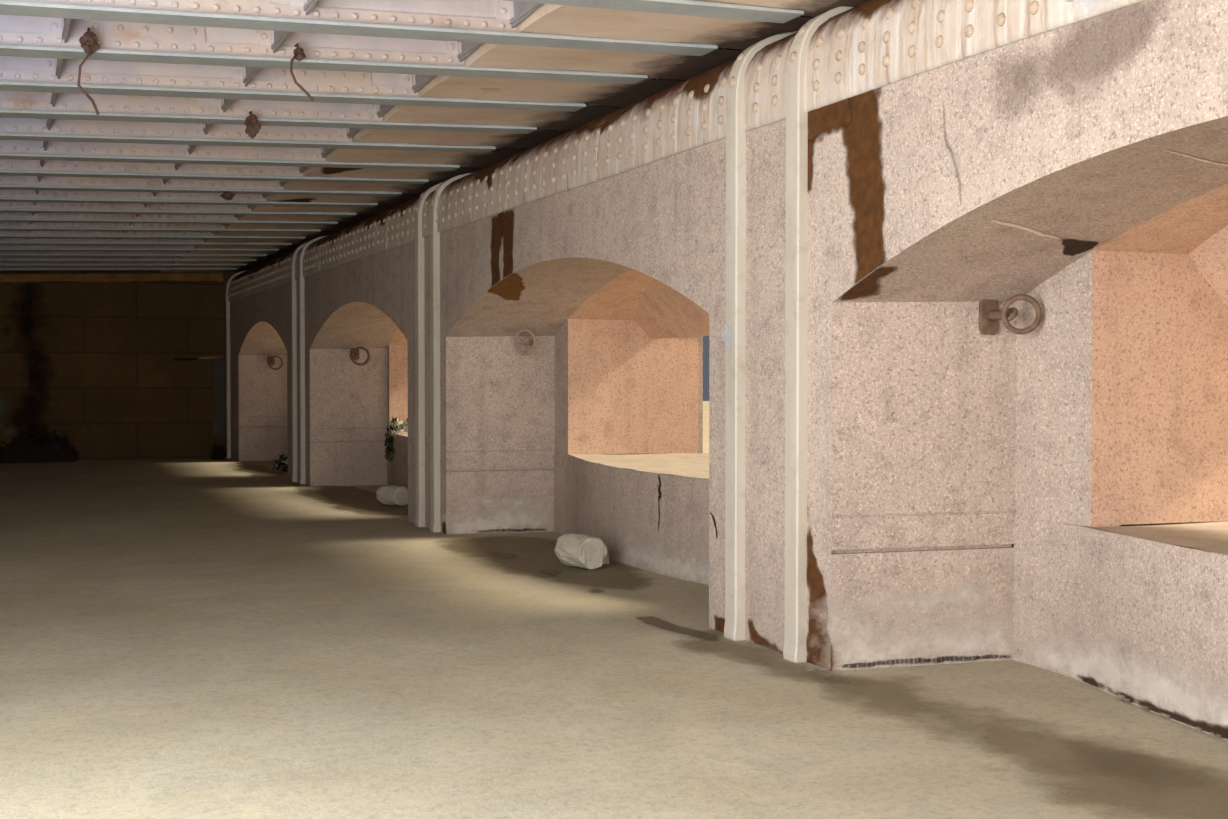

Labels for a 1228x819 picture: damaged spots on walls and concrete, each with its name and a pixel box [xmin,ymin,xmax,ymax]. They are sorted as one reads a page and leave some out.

corrosion [488,210,525,300]
corrosion [807,88,896,300]
crack [656,475,664,528]
corrosion [806,530,833,671]
damp [637,615,1228,819]